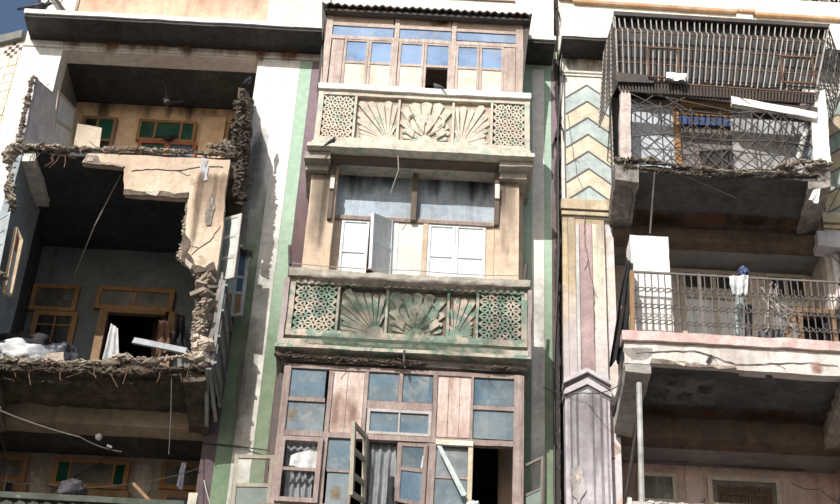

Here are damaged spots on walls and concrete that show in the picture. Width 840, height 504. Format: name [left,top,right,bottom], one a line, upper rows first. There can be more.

spalling [1,75,251,213]
crack [132,166,223,176]
spalling [613,155,834,180]
spalling [0,349,205,388]
crack [636,350,837,369]